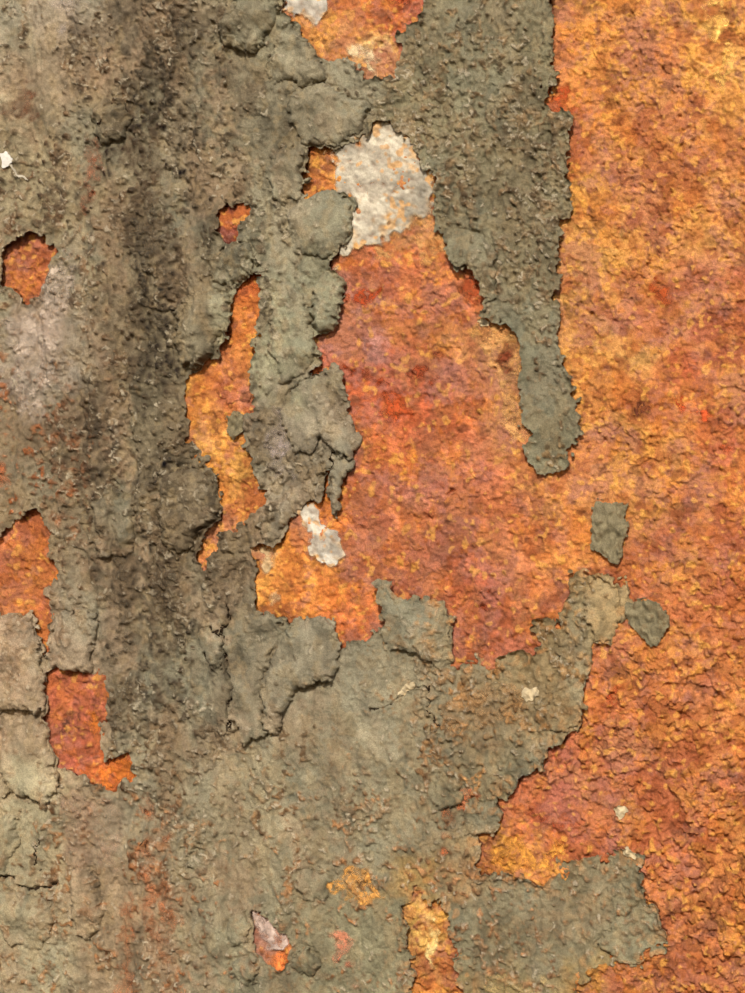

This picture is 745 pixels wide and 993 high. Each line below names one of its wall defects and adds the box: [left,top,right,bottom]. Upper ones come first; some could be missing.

corrosion [714,18,735,85]
peeling [214,203,251,244]
peeling [0,231,58,305]
corrosion [345,286,382,305]
corrosion [459,272,481,305]
corrosion [497,345,513,372]
peeling [184,273,268,571]
corrosion [342,364,413,420]
corrosion [634,401,651,416]
peeling [222,0,745,993]
peeling [0,508,136,811]